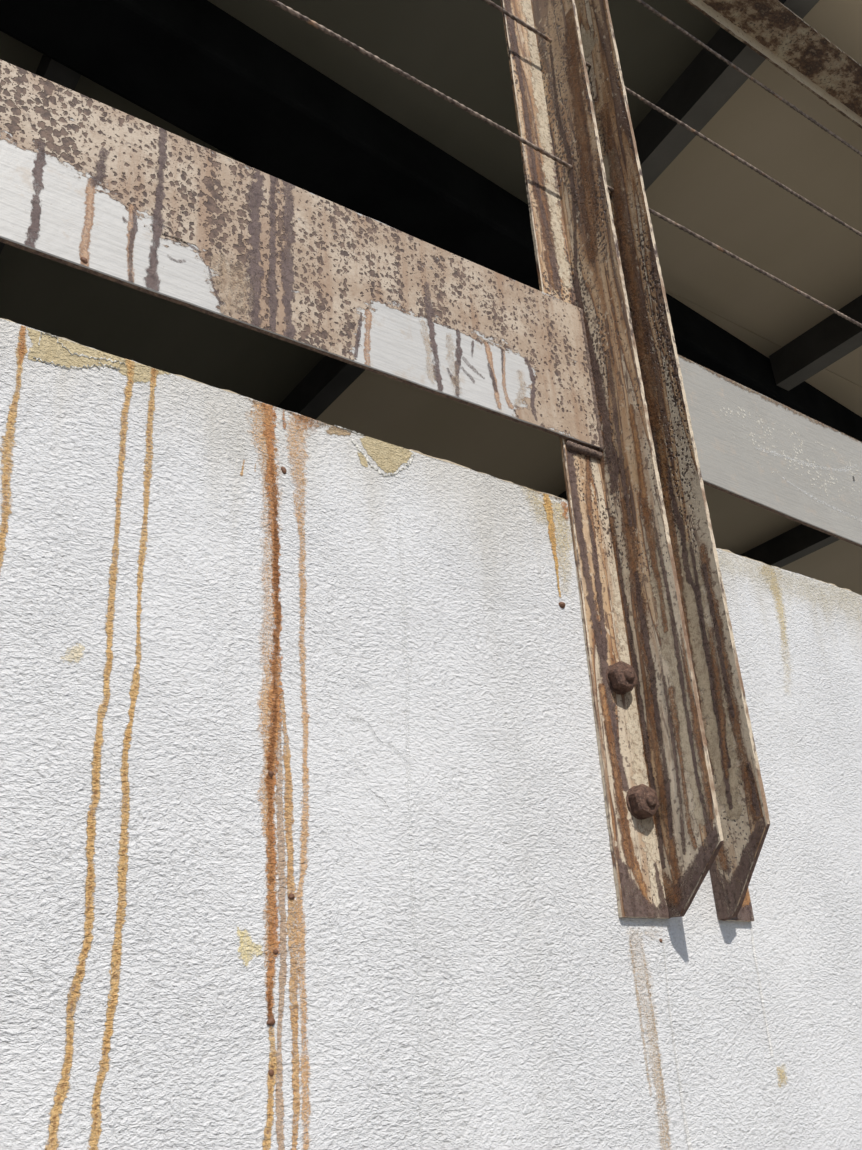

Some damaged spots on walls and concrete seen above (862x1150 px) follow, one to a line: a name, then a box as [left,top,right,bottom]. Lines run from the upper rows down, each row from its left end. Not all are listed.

rust [45,358,135,1150]
rust [88,369,158,1150]
rust [239,395,352,1150]
rust [0,0,765,921]